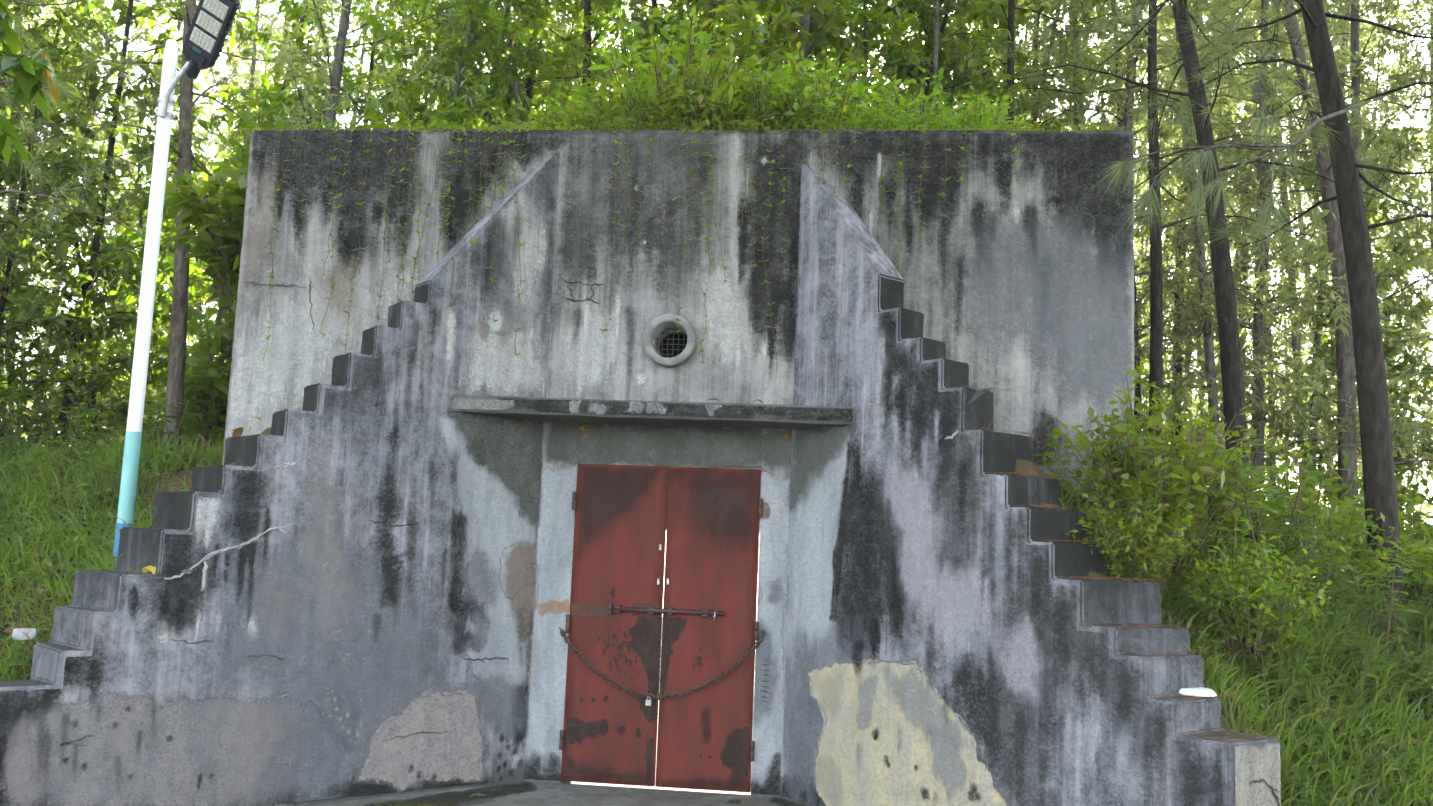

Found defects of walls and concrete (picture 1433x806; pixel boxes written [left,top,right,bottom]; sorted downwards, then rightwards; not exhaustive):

leakage [469,324,544,395]
leakage [698,211,797,368]
leakage [850,154,1132,404]
leakage [448,412,543,525]
crack [163,523,295,591]
leakage [753,338,1065,806]
leakage [160,498,533,802]
flaking render [355,689,523,791]
leakage [363,782,535,806]
corrosion [565,615,687,779]
corrosion [699,726,749,776]
flaking render [808,658,1007,806]